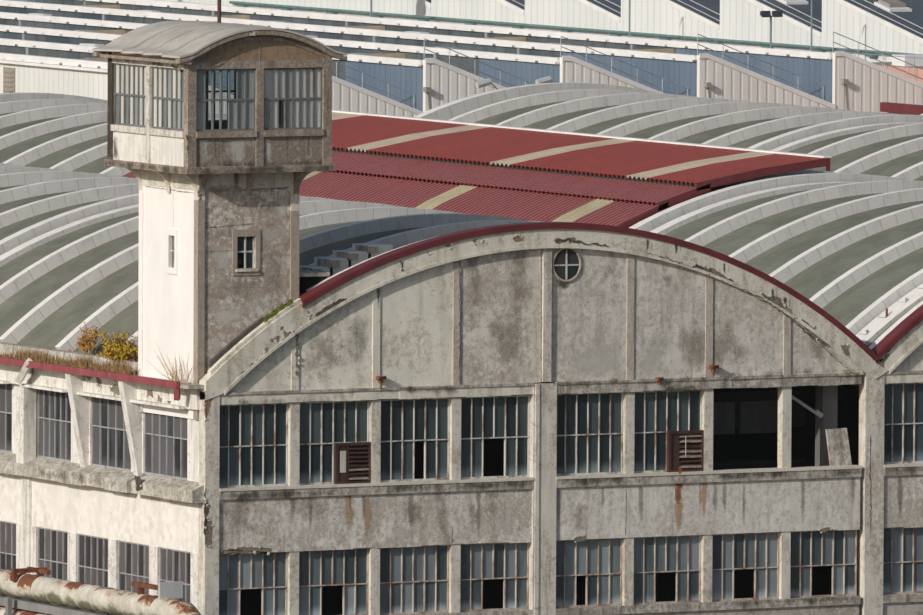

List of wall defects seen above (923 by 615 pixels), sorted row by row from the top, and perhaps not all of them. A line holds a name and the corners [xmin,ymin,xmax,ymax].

crack [541,238,610,383]
spalling [263,326,301,376]
crack [203,489,211,546]
rust [345,487,354,524]
rust [675,467,683,528]